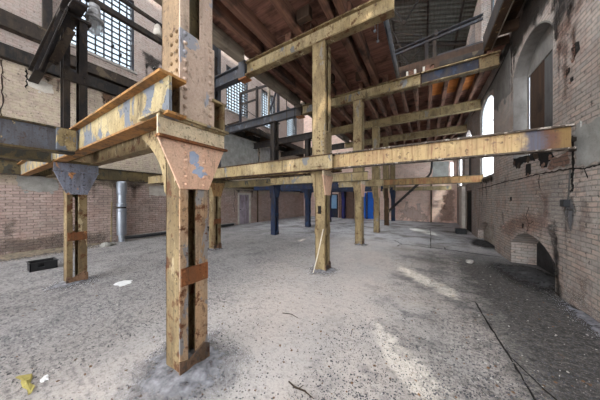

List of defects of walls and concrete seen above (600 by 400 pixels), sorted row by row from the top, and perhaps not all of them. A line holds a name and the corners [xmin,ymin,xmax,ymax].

peeling [190,151,207,178]
crack [478,142,600,196]
spalling [513,152,570,176]
crack [475,302,557,400]